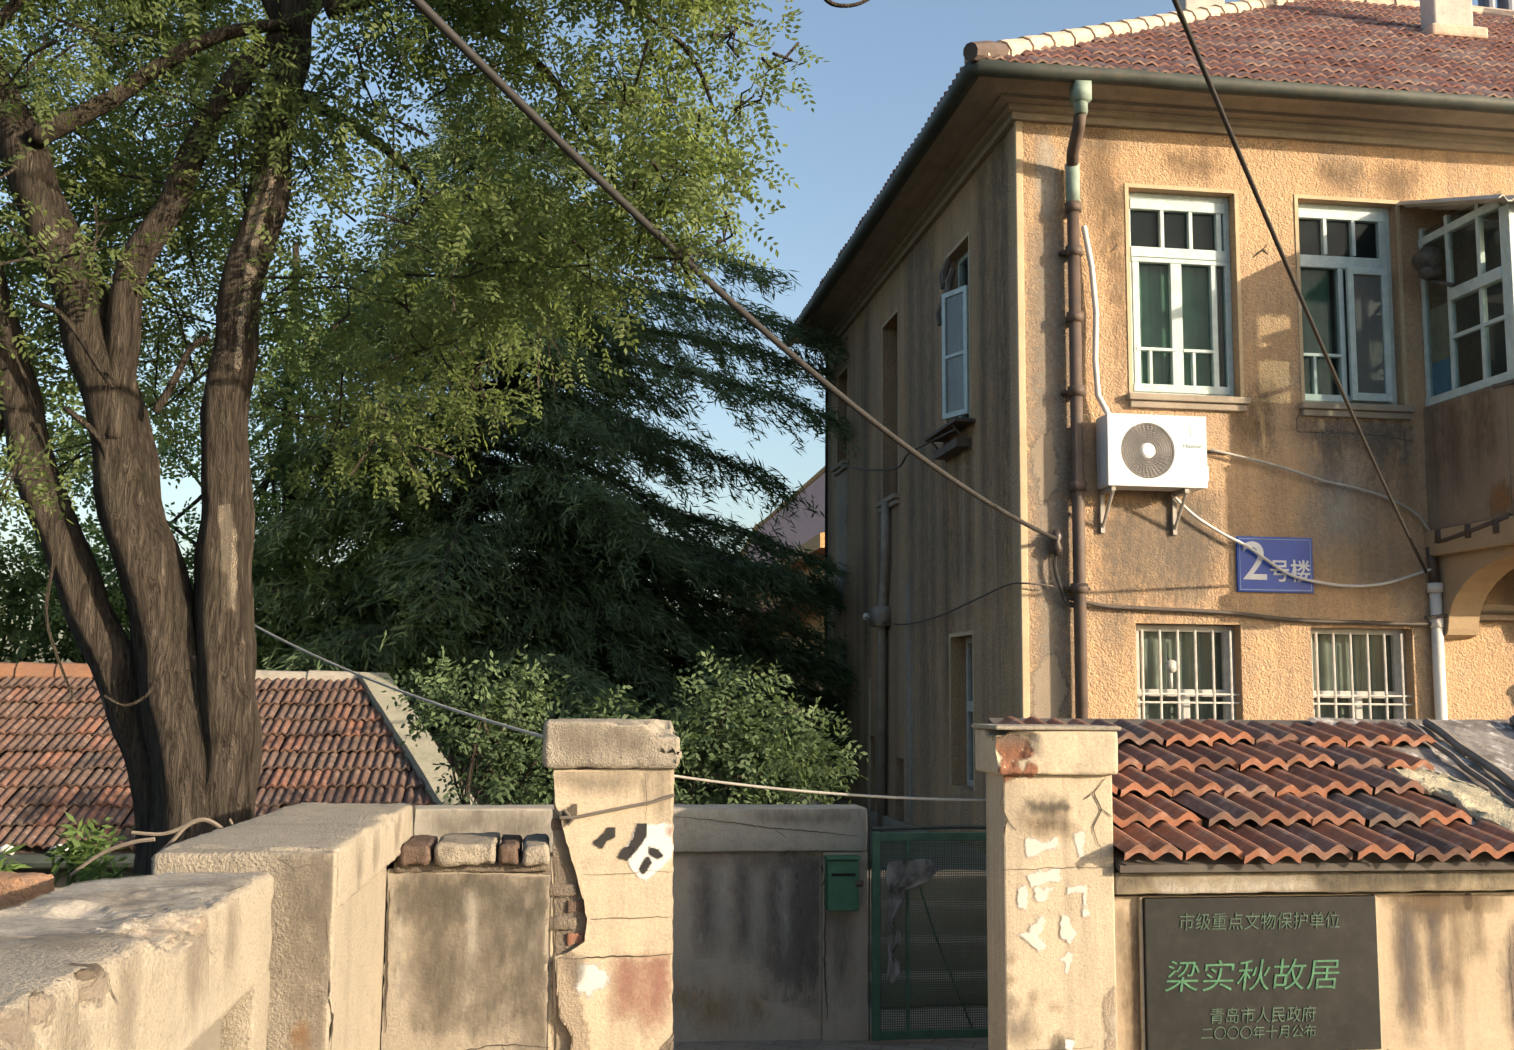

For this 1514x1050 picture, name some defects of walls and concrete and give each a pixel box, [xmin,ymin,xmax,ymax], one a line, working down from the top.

crack [1000,779,1112,870]
spalling [0,988,57,1046]
spalling [67,963,109,1007]
damp [437,883,548,1039]
flaking render [548,804,590,1050]
flaking render [658,1033,675,1050]
damp [699,862,848,981]
damp [1317,871,1500,1014]